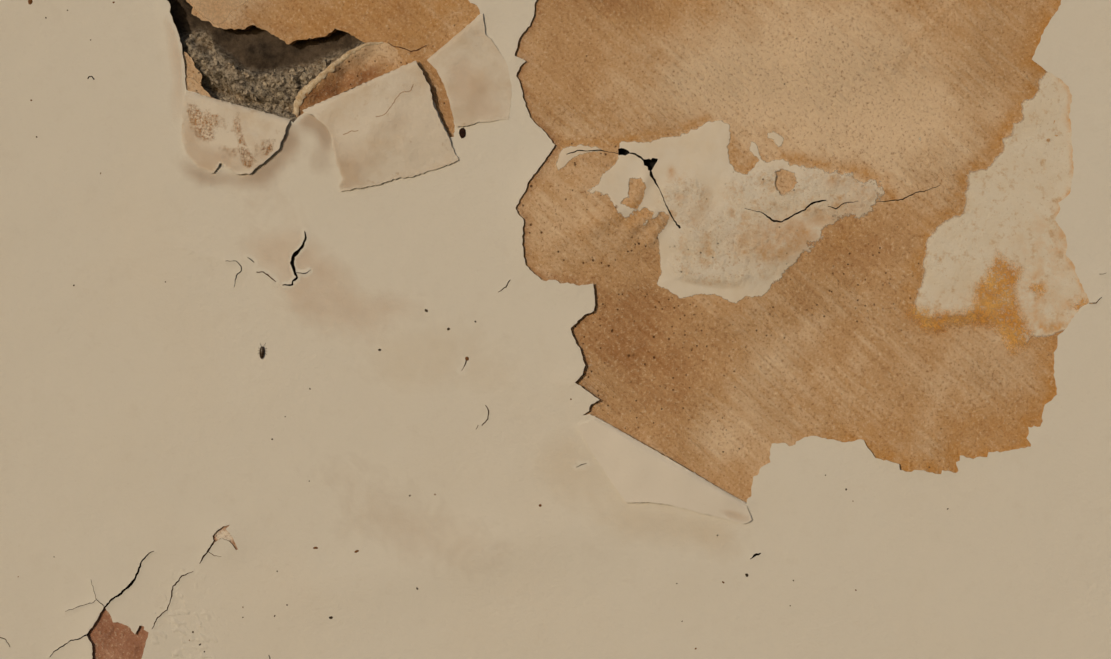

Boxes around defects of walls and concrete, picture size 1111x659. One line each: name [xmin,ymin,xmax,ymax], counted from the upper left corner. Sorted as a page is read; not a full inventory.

crack [568,148,681,228]
crack [227,231,310,287]
peeling [168,0,1064,524]
crack [65,551,154,612]
peeling [87,599,149,659]